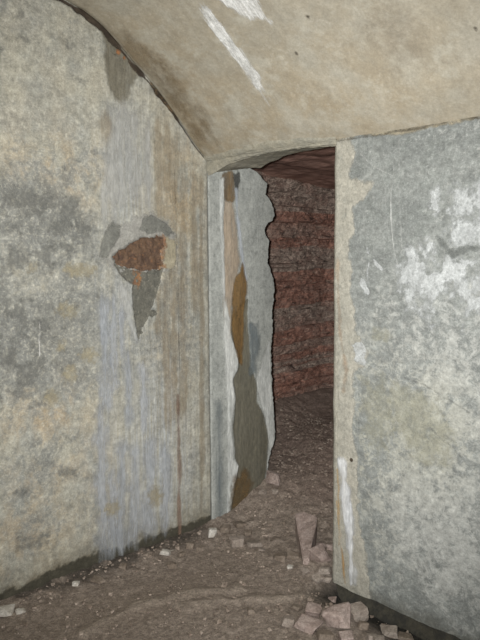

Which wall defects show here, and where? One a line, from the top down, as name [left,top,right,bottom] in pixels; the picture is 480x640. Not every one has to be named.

damp [100,30,137,101]
damp [200,8,263,89]
damp [221,0,271,24]
flaking render [100,212,177,341]
damp [335,379,357,585]